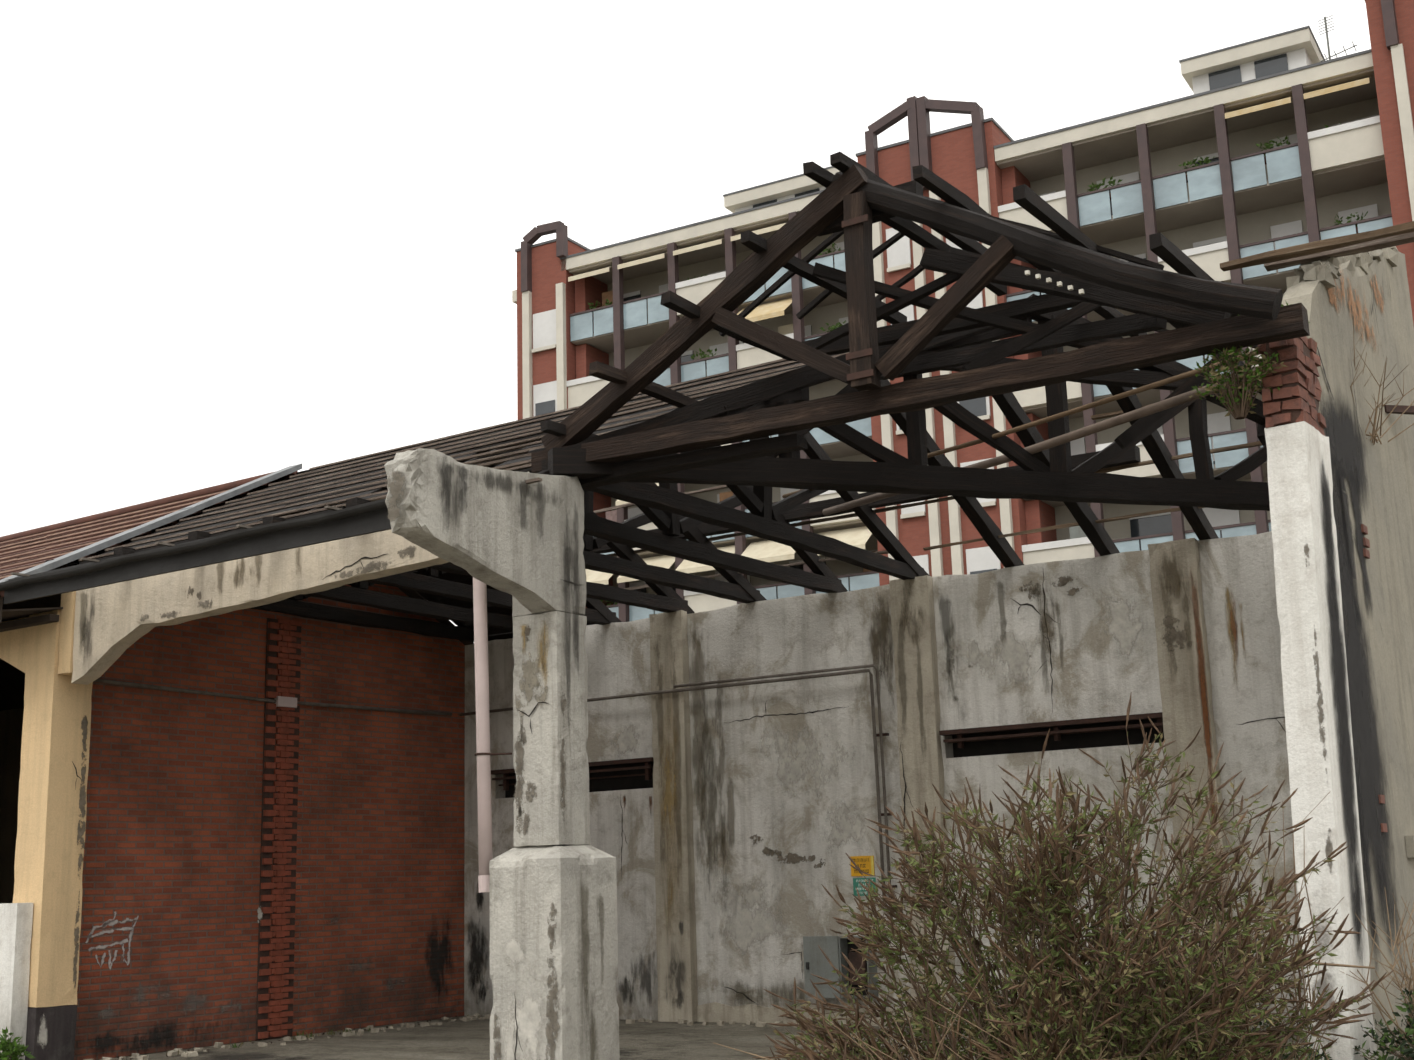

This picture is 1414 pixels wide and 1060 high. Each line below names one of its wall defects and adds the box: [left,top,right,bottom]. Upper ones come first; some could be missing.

peeling [1328,268,1384,351]
water stain [441,465,467,519]
crack [322,554,386,580]
rust [1191,578,1214,831]
water stain [1322,400,1399,949]
water stain [426,921,454,996]
water stain [620,959,651,1002]
water stain [669,954,683,1006]